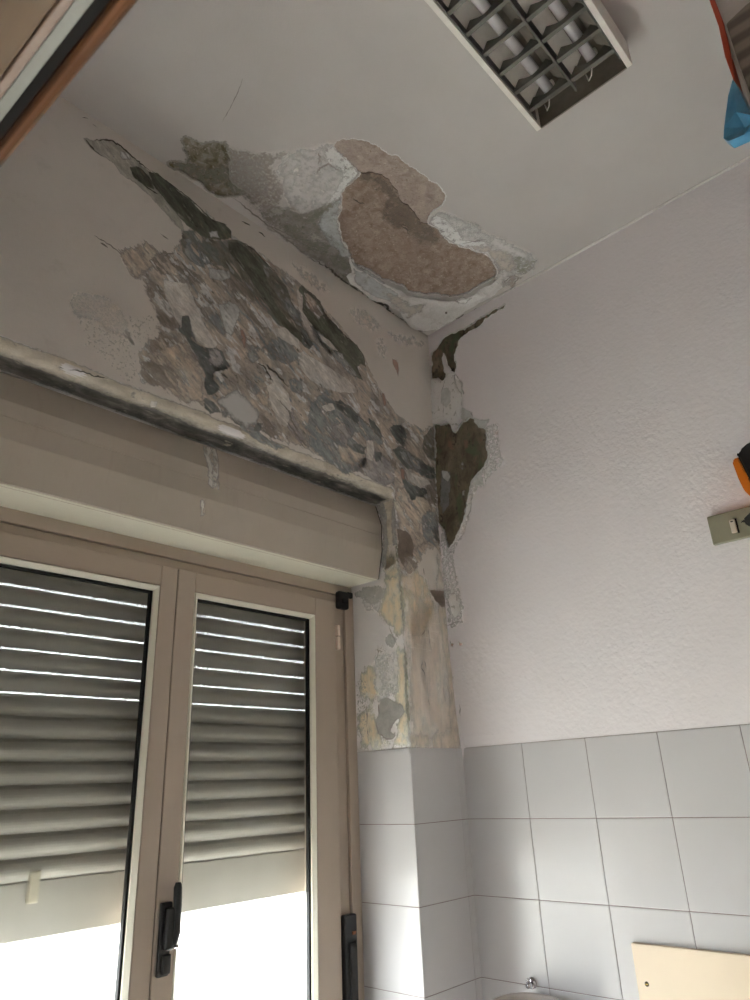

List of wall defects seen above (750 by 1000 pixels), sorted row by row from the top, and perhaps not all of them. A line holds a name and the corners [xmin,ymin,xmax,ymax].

leakage [0,293,458,748]
peeling [84,135,535,576]
spalling [375,697,405,740]
spalling [429,590,445,607]